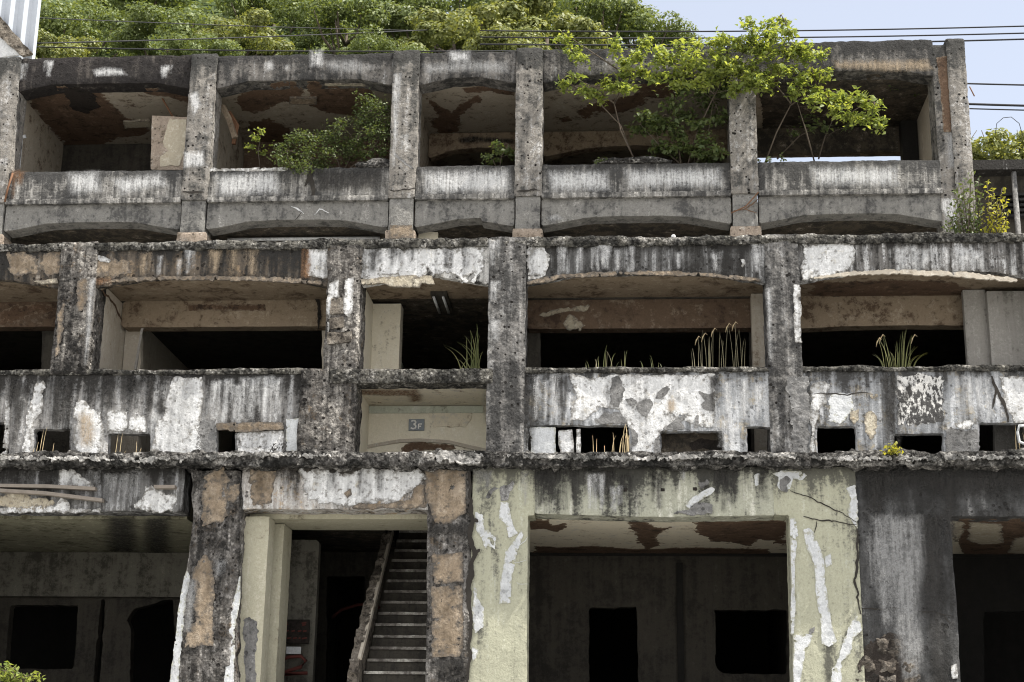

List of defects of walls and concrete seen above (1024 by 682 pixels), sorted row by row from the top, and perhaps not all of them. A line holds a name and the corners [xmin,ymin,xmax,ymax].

peeling [306,225,489,345]
damp [7,382,26,453]
damp [48,379,70,425]
damp [103,379,174,415]
damp [243,378,280,420]
peeling [0,376,567,604]
peeling [497,373,1024,492]
crack [991,376,1009,422]
spalling [170,554,215,682]
peeling [532,480,921,682]
crack [790,490,952,623]
damp [867,470,1024,682]